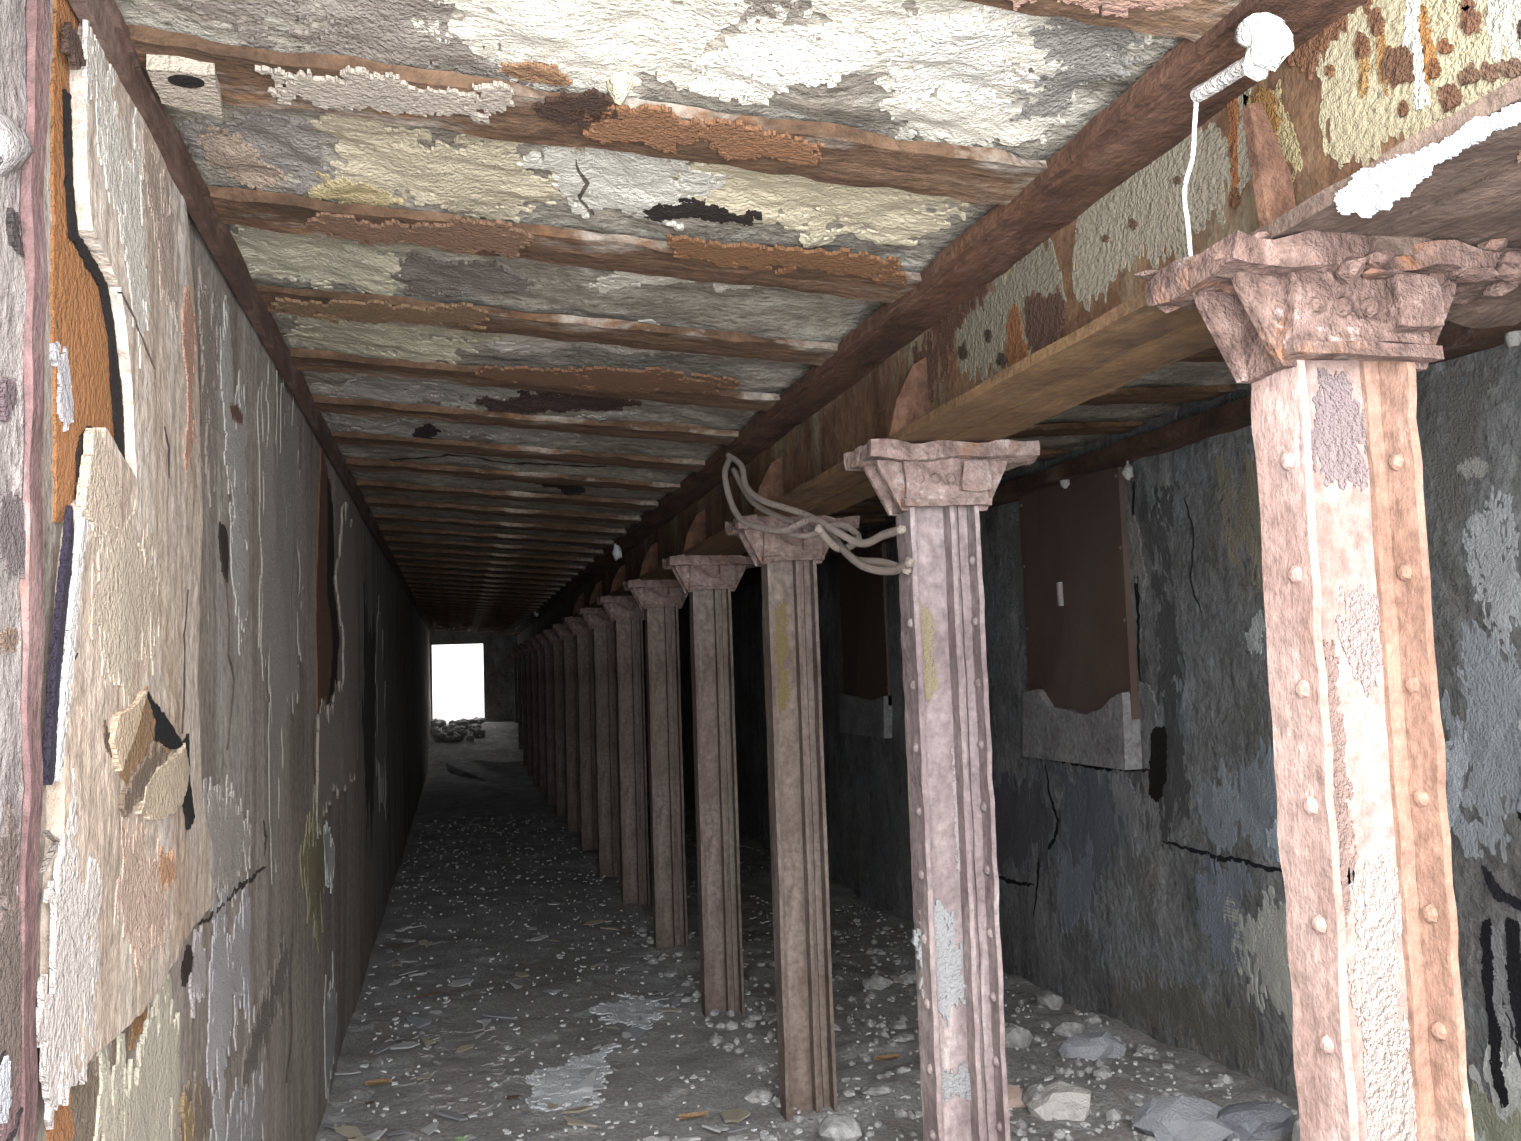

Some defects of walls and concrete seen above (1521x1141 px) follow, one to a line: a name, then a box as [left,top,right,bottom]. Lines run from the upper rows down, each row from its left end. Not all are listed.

spalling [1057,0,1193,18]
leakage [1402,0,1429,111]
peeling [1316,0,1521,169]
hole [643,197,762,226]
peeling [955,79,1303,383]
leakage [1334,102,1521,218]
peeling [0,490,26,579]
peeling [40,22,214,1083]
spalling [1456,456,1521,653]
crack [198,820,267,925]
crack [998,758,1148,916]
spalling [1490,923,1516,1069]